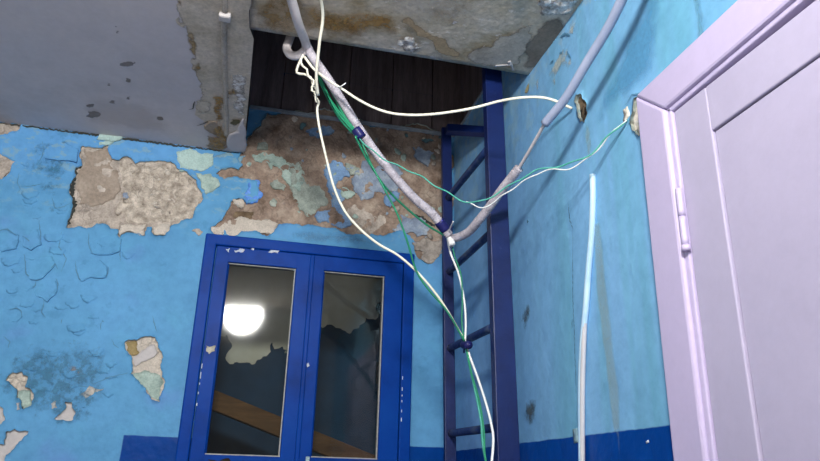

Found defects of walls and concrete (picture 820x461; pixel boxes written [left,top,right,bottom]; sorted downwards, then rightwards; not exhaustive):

spalling [0,124,20,135]
spalling [175,0,442,264]
spalling [0,154,15,179]
spalling [67,146,203,237]
spalling [7,372,34,410]
leakage [15,353,97,421]
spalling [125,337,165,402]
spalling [0,430,28,461]